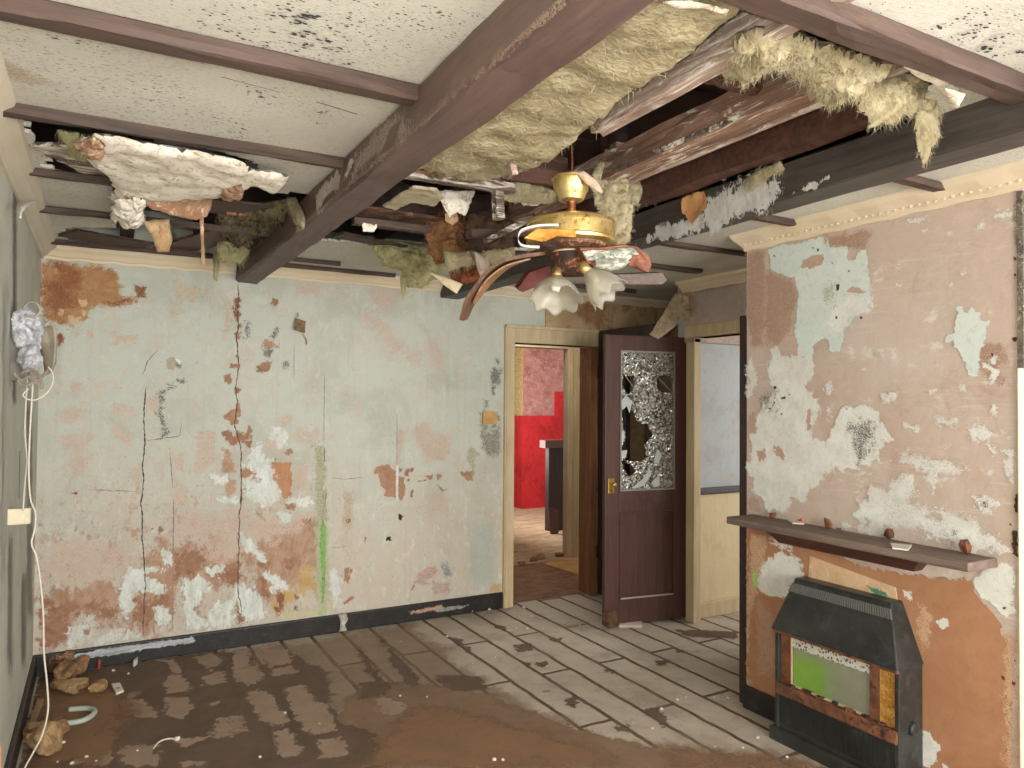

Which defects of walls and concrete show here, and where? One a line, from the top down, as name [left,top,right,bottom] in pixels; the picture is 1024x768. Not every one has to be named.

peeling [681,191,707,225]
peeling [973,201,1017,260]
crack [107,352,181,629]
flaking render [33,374,356,655]
crack [234,289,243,614]
flaking render [374,464,445,501]
peeling [744,236,899,514]
flaking render [745,306,1019,768]